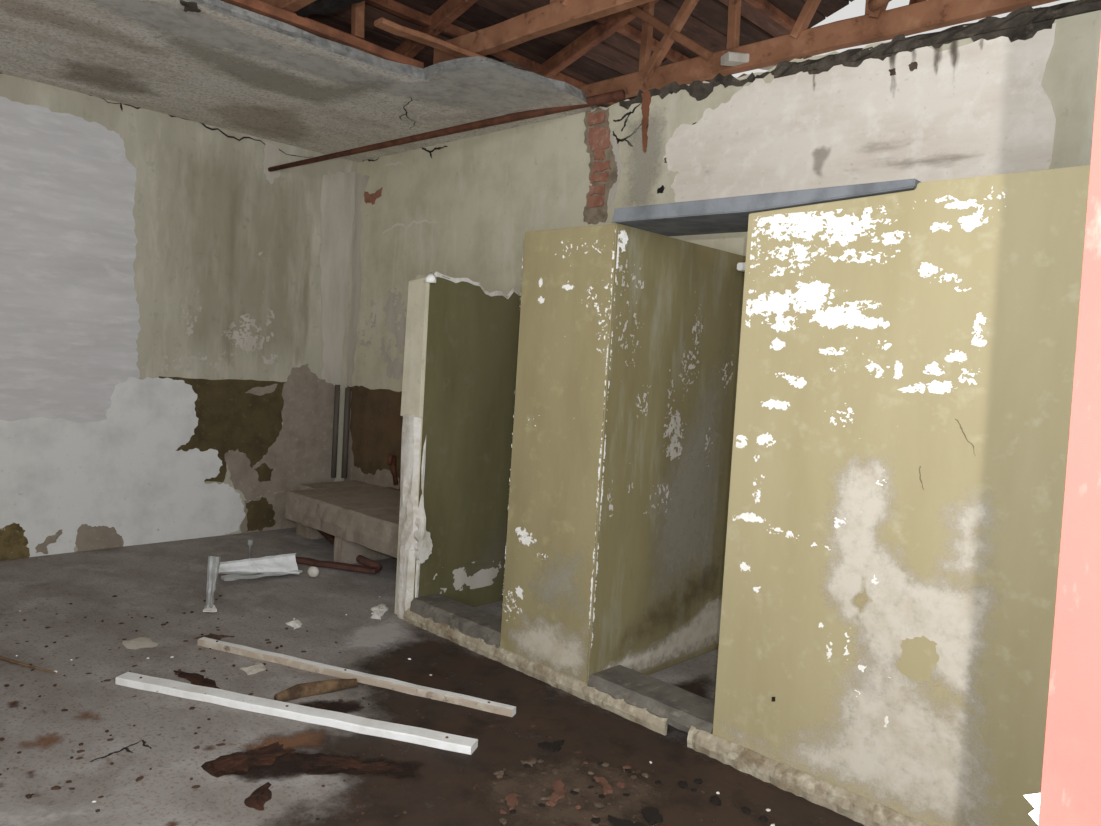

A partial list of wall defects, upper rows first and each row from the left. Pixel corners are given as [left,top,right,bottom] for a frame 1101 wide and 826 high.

crack [613,102,643,147]
peeling [657,23,1056,233]
flaking render [555,107,644,405]
peeling [745,205,911,351]
peeling [0,523,62,561]
peeling [142,308,400,533]
peeling [433,546,524,621]
peeling [736,432,776,462]
peeling [732,475,799,541]
damp [794,461,990,826]
peeling [862,312,987,394]
damp [276,618,864,826]